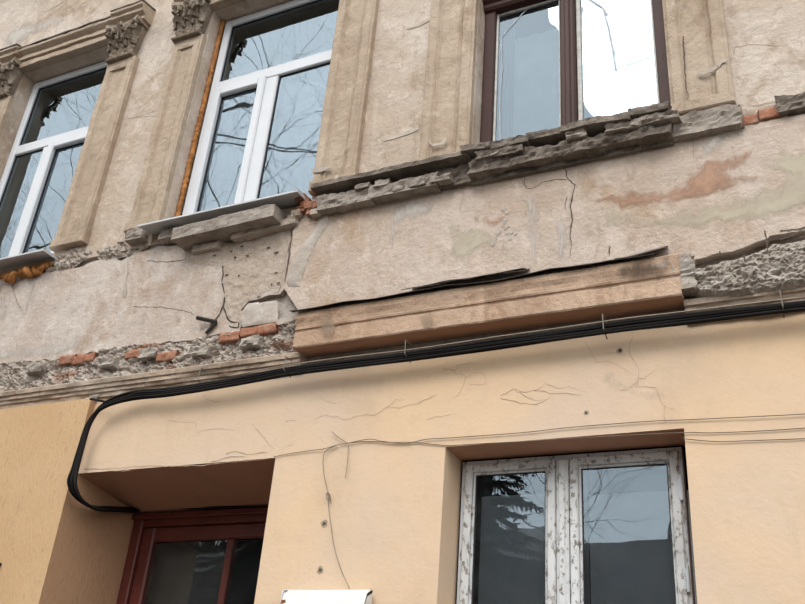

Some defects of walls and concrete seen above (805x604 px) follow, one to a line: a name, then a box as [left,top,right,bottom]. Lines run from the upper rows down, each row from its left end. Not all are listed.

peeling [460,101,682,160]
flaking render [742,101,788,126]
crack [522,168,575,255]
spalling [45,227,177,273]
peeling [188,193,322,319]
spalling [670,231,805,299]
crack [134,266,240,331]
spalling [0,318,297,392]
crack [316,394,451,420]
crack [501,383,588,405]